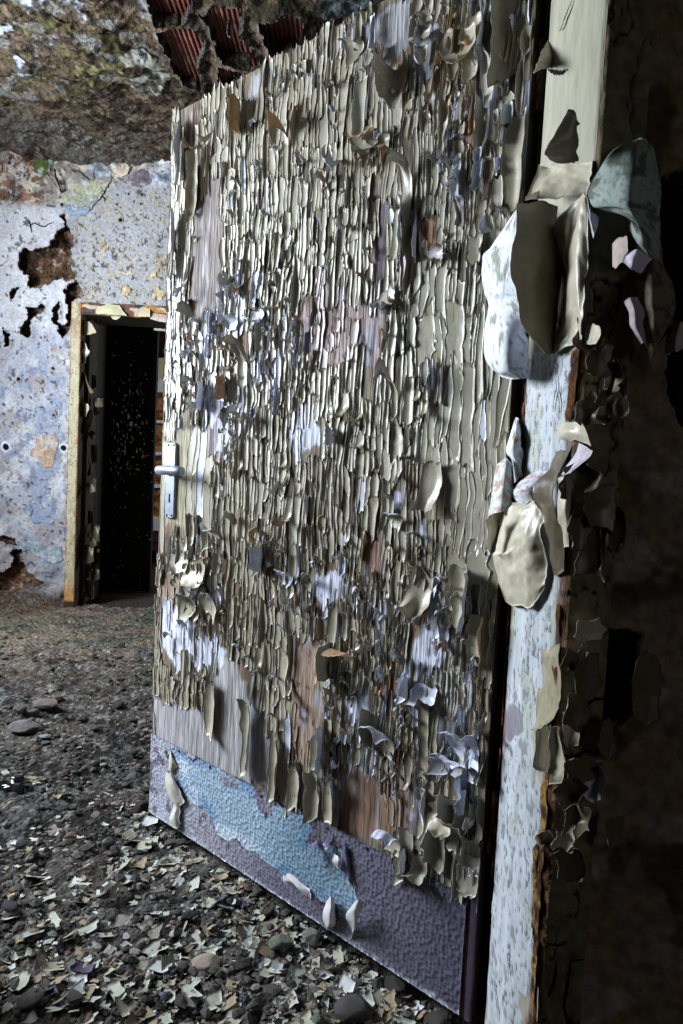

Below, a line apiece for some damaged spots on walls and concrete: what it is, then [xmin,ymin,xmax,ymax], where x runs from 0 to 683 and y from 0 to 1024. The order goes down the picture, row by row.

flaking render [4,189,82,346]
peeling [79,0,683,914]
flaking render [0,535,43,592]